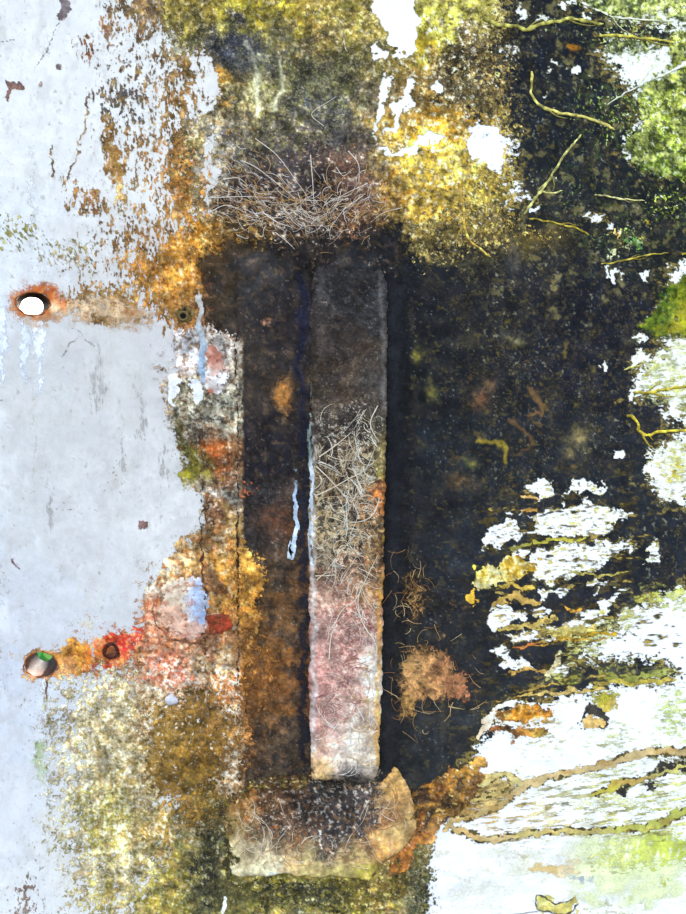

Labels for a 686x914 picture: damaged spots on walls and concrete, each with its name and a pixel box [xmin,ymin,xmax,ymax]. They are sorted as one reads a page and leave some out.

peeling [57,0,72,21]
damp [0,306,47,405]
rust [8,0,281,804]
peeling [168,291,229,407]
damp [196,0,686,856]
peeling [465,588,479,607]
rust [389,756,488,877]
peeling [7,870,40,914]
damp [189,818,227,914]
damp [410,869,438,914]
spalling [535,895,579,914]